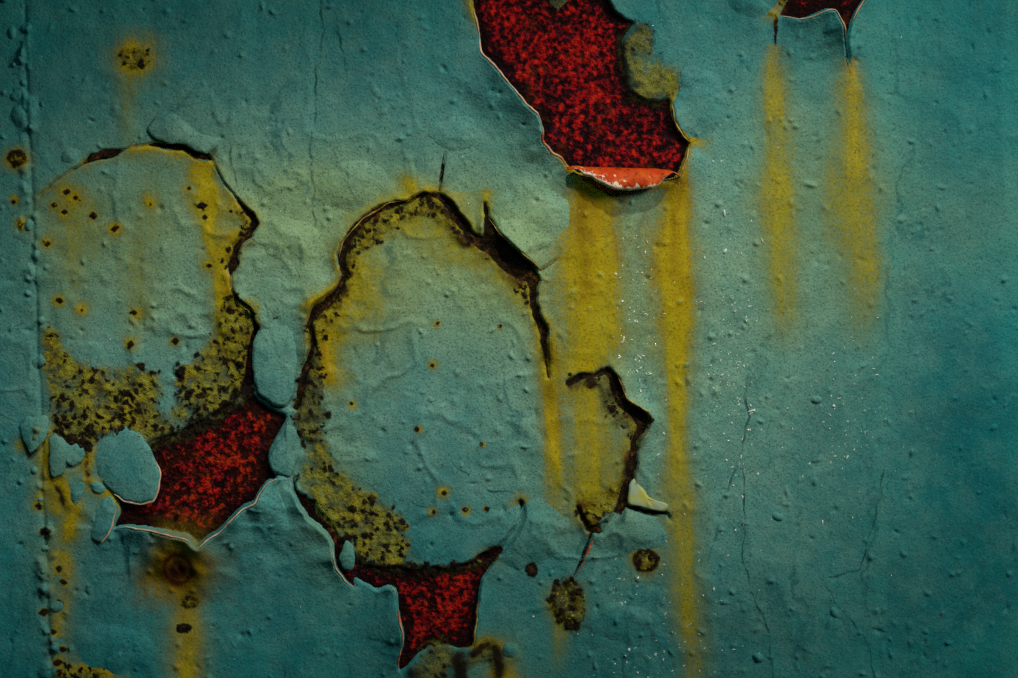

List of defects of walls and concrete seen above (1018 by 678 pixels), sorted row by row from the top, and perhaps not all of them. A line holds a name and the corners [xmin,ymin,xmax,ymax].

spalling [51,183,83,218]
spalling [107,222,123,235]
corrosion [116,37,158,83]
spalling [197,200,209,220]
peeling [466,0,727,208]
corrosion [758,45,795,321]
peeling [728,0,864,73]
corrosion [827,59,879,299]
peeling [17,266,519,678]
corrosion [539,179,626,511]
corrosion [630,161,701,677]
corrosion [546,575,585,650]